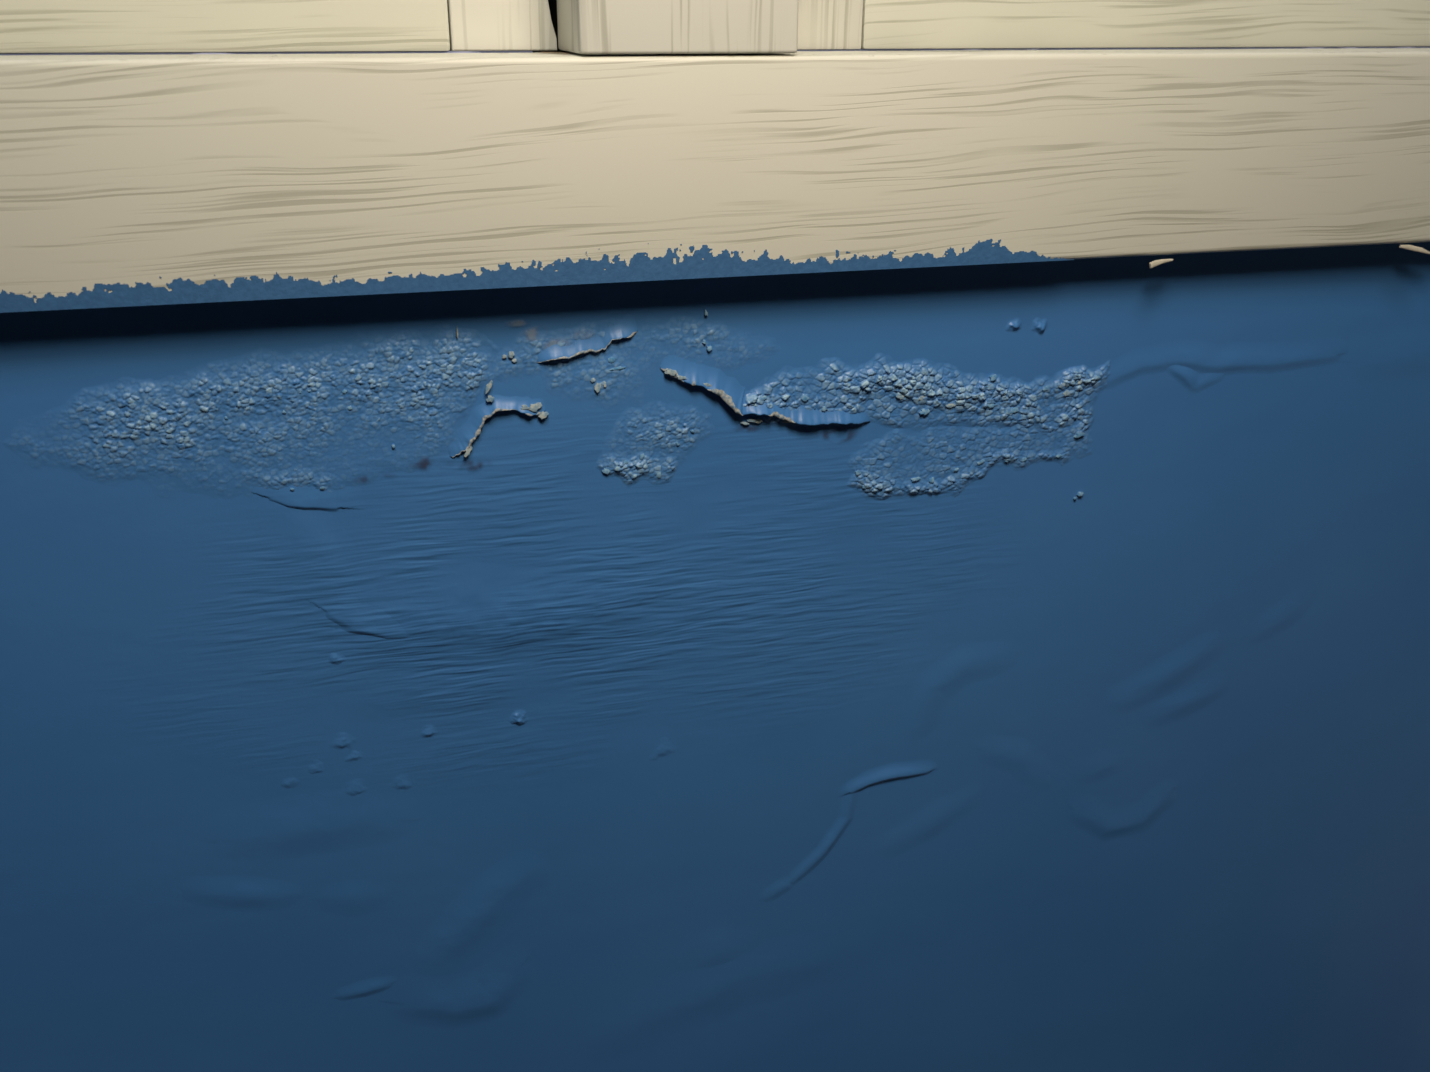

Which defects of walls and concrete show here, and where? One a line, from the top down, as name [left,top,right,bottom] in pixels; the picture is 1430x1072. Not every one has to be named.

peeling [448,380,549,457]
peeling [537,314,638,393]
peeling [660,340,870,426]